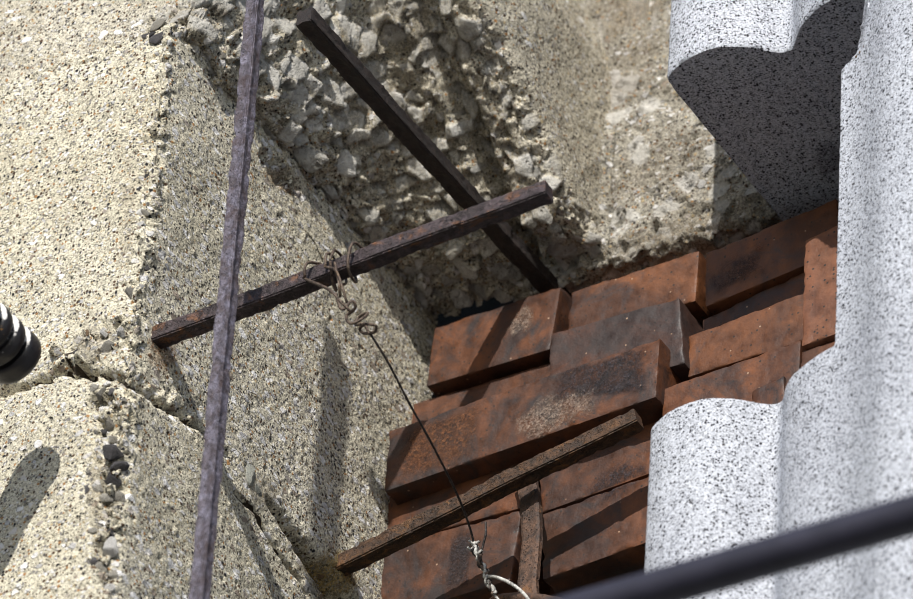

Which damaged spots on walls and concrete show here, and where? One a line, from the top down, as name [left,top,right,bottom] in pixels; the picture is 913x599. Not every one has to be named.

spalling [265,163,300,198]
crack [33,329,193,429]
crack [234,495,294,577]